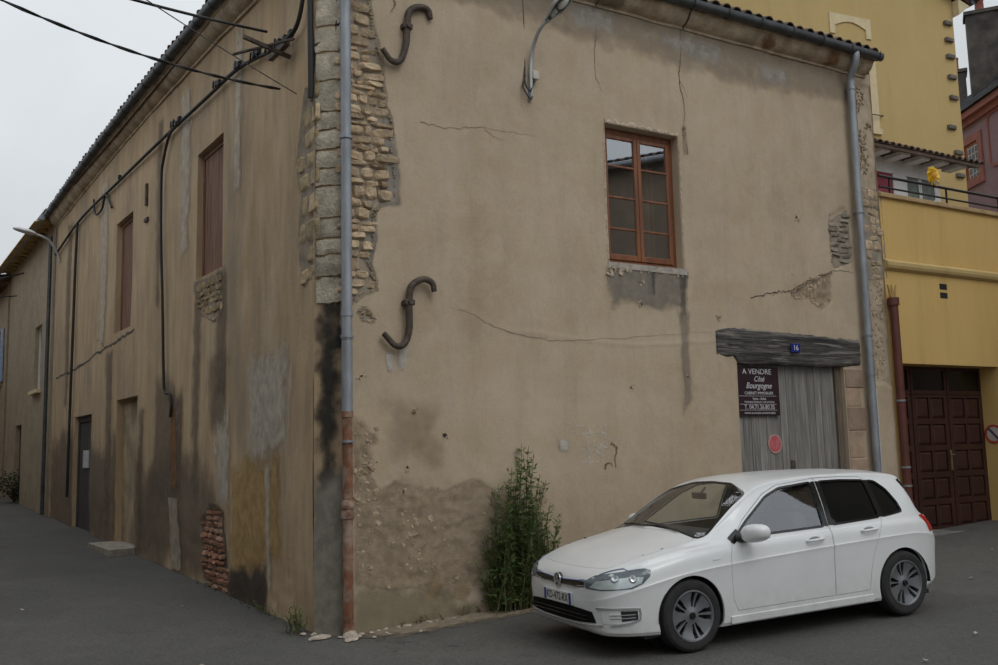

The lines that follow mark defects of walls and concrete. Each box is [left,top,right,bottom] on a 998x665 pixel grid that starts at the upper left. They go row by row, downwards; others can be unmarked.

flaking render [296,81,320,286]
flaking render [334,0,400,325]
crack [420,121,533,141]
crack [678,9,692,155]
flaking render [858,123,872,175]
flaking render [194,272,226,322]
flaking render [789,211,852,309]
flaking render [862,188,887,380]
damp [316,301,341,484]
flaking render [200,500,230,594]
peeling [353,419,506,603]